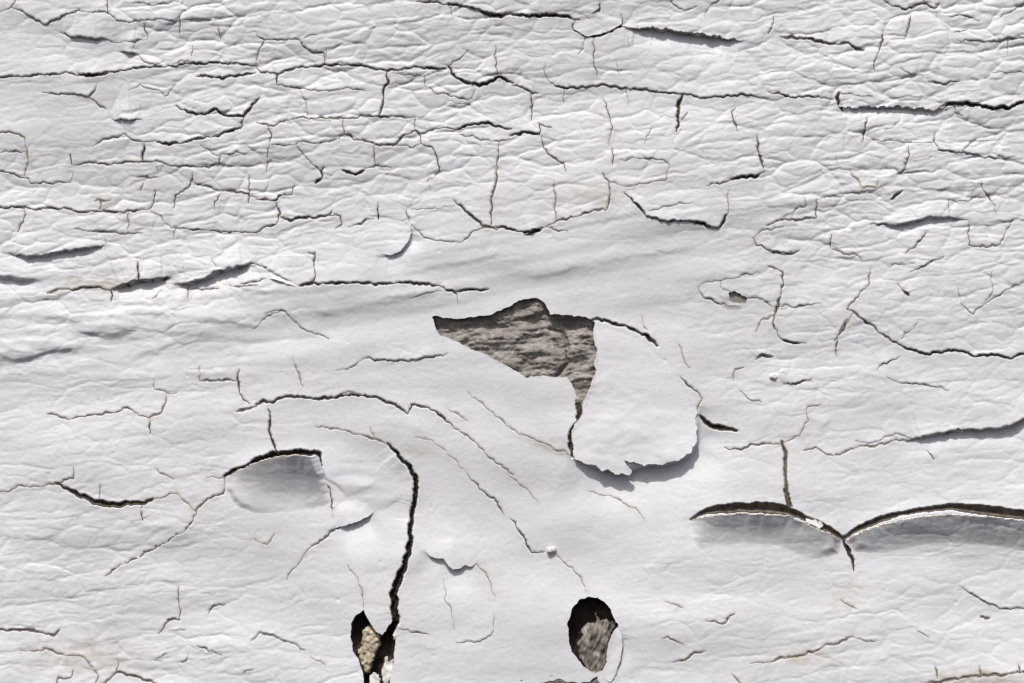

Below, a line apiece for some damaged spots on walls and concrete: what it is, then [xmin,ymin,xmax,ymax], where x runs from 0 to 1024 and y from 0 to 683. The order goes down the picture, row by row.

crack [768,0,1024,73]
crack [0,0,853,256]
crack [48,253,488,302]
crack [698,68,1024,402]
crack [0,353,586,643]
peeling [432,298,697,476]
crack [592,318,1024,570]
crack [252,632,326,665]
peeling [370,656,394,683]
peeling [543,628,623,683]